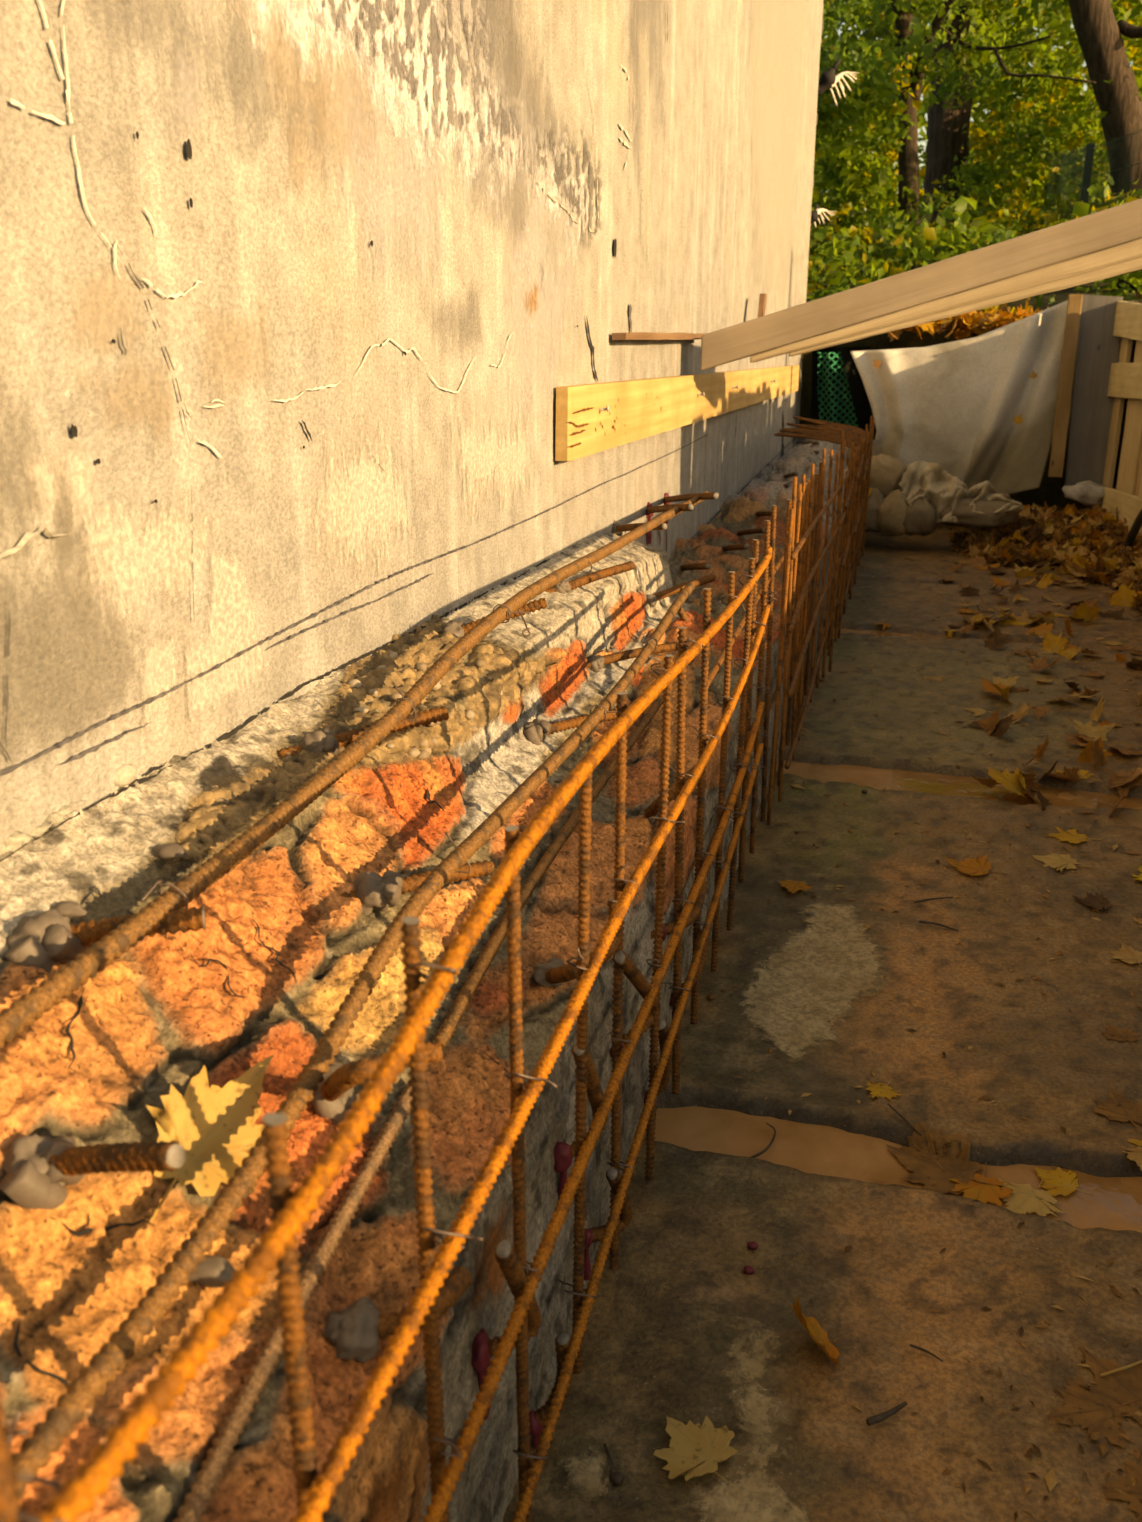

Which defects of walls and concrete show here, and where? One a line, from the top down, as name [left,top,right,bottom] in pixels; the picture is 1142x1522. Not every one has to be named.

crack [10,0,222,458]
leakage [232,0,602,258]
crack [275,332,516,441]
crack [0,526,68,559]
crack [188,489,196,609]
crack [0,534,606,862]
spalling [0,491,709,1049]
spalling [275,581,695,1138]
spalling [740,903,885,1060]
spalling [11,1132,268,1500]
spalling [173,1316,284,1522]
spalling [299,1079,412,1310]